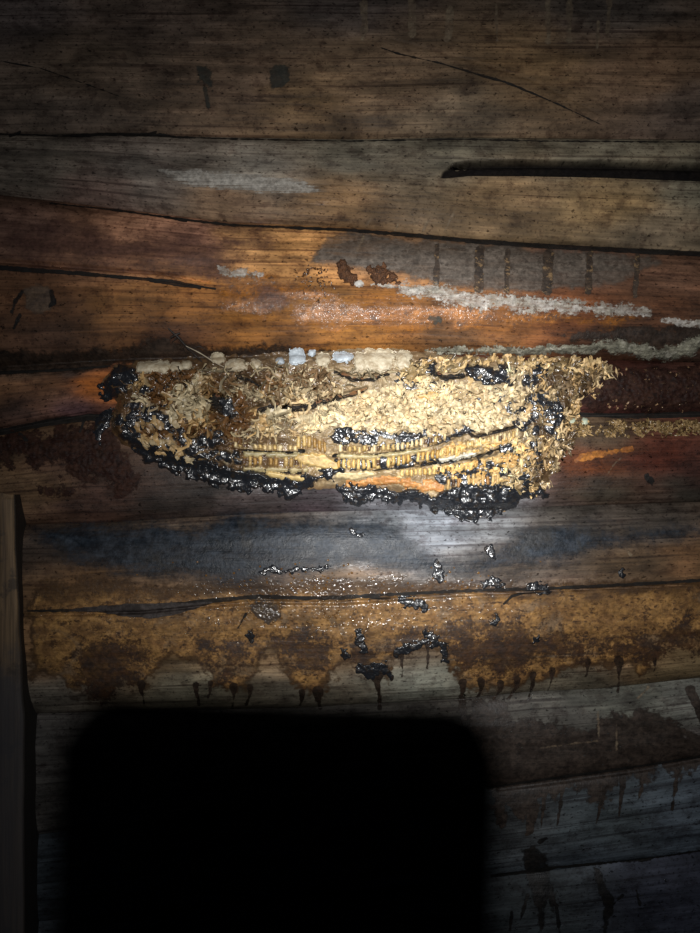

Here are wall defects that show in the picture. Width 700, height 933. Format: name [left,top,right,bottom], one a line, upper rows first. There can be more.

crack [0,45,700,181]
crack [0,265,216,329]
water stain [0,338,291,375]
water stain [11,220,700,362]
water stain [26,575,700,933]